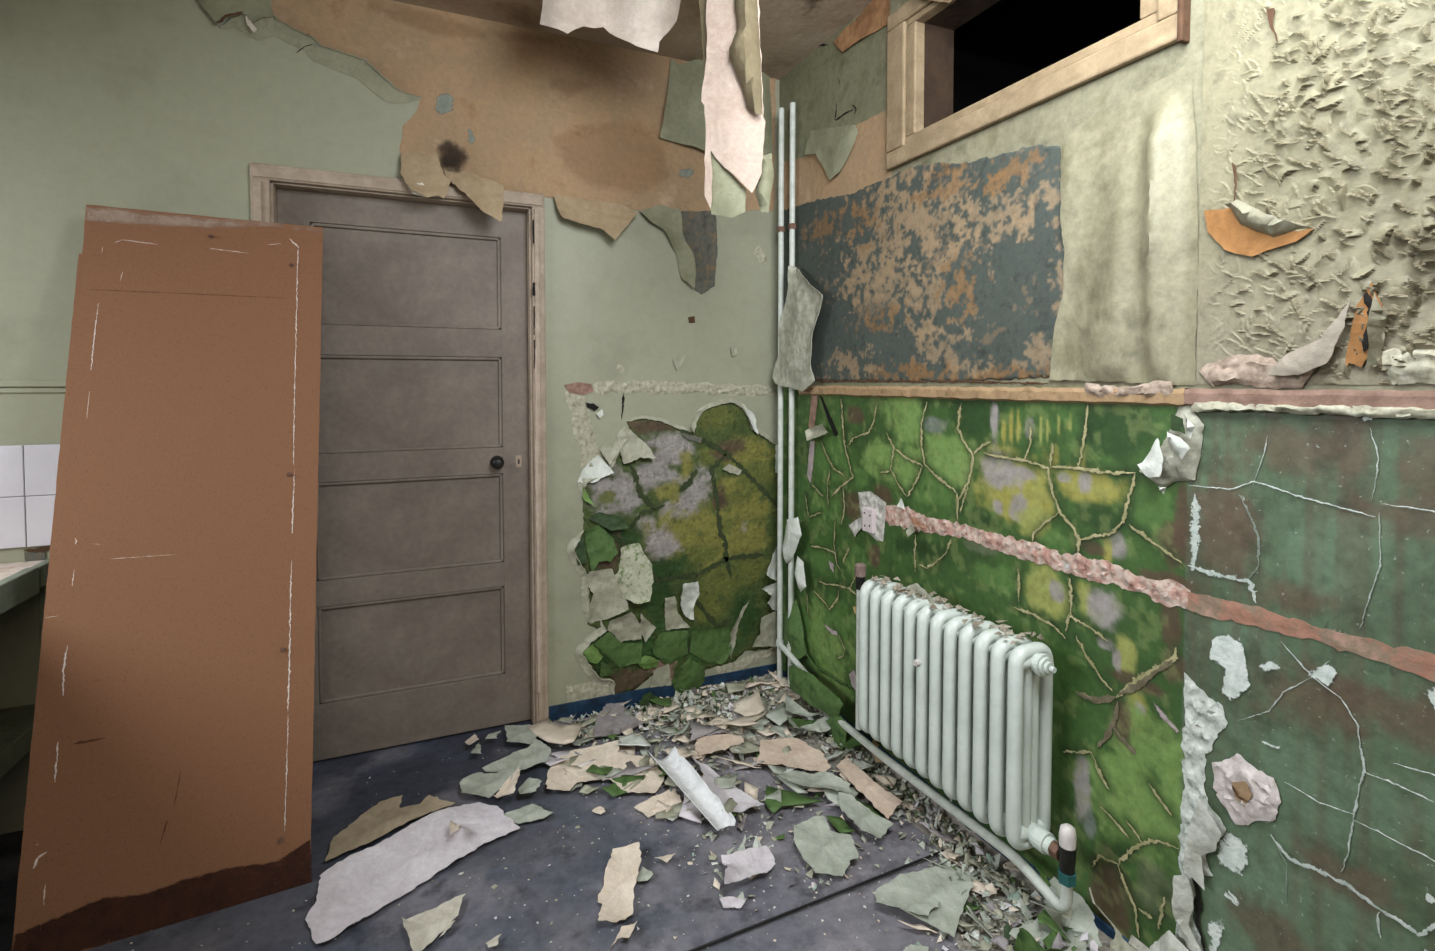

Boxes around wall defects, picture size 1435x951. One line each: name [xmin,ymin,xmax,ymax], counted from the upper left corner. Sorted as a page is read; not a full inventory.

flaking render [271,0,718,294]
peeling [1196,0,1435,385]
peeling [567,398,902,876]
spalling [1009,672,1228,951]
crack [805,379,1435,951]